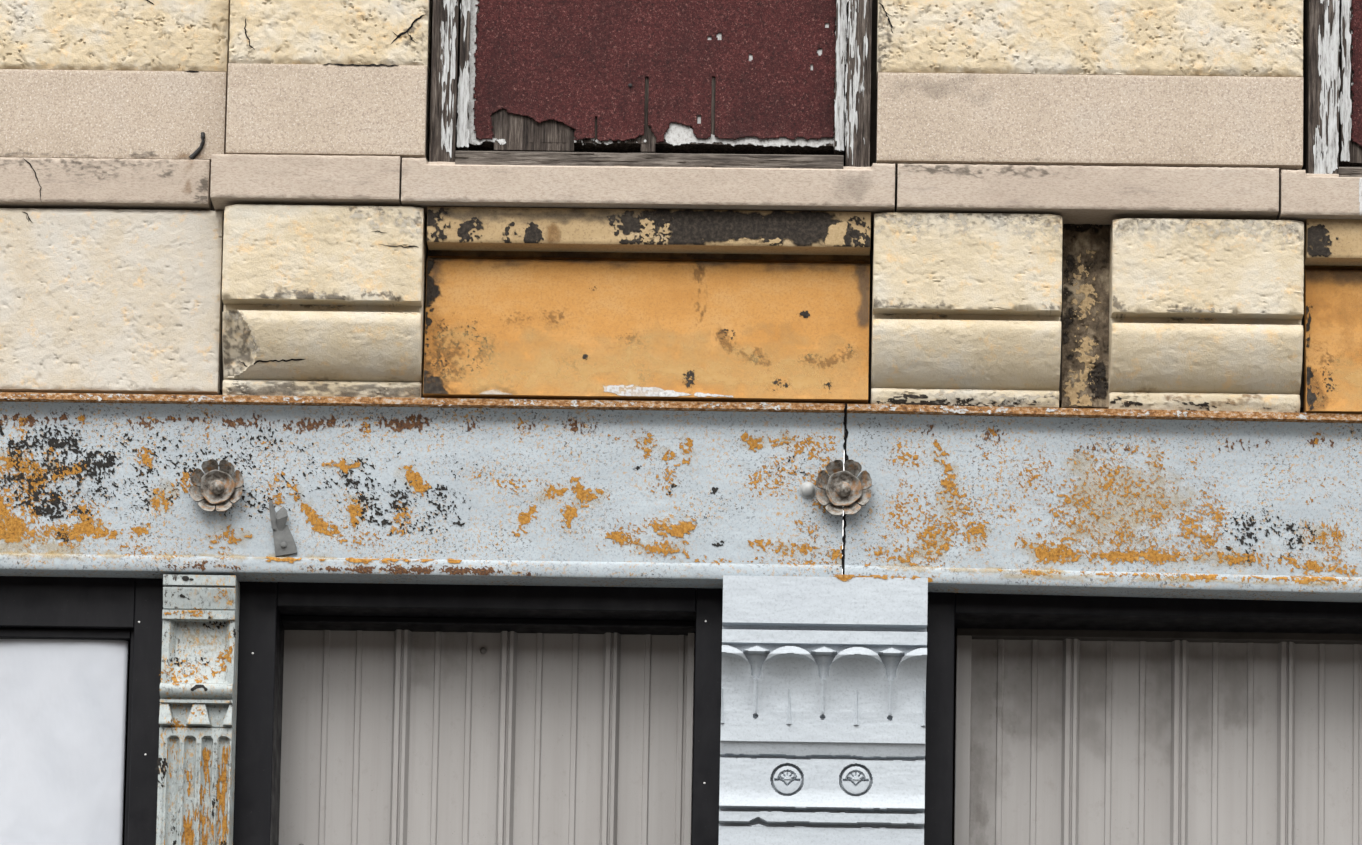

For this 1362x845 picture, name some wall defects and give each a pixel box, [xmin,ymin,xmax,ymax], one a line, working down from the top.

peeling [439,0,506,157]
peeling [664,0,868,165]
peeling [1313,0,1354,174]
crack [23,158,41,222]
water stain [1064,224,1110,234]
peeling [421,207,870,406]
water stain [877,249,1143,407]
peeling [0,421,497,543]
crack [839,506,847,574]
crack [842,404,850,465]
water stain [1167,395,1250,411]
peeling [1222,503,1320,565]